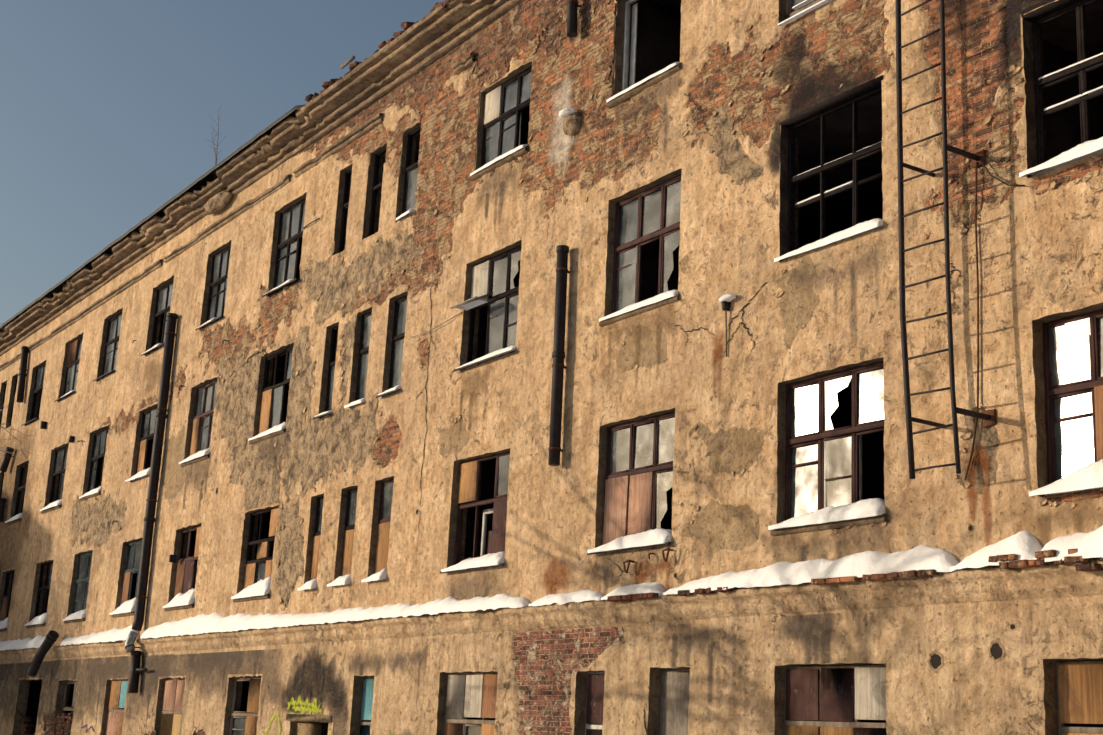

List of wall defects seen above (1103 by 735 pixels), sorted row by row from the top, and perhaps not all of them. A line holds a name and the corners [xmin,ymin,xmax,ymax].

flaking render [682,0,892,185]
flaking render [922,0,1025,235]
flaking render [1033,157,1103,195]
flaking render [102,0,672,611]
crack [675,282,767,358]
peeling [776,255,820,349]
peeling [692,421,768,477]
corrosion [968,447,989,520]
peeling [683,499,760,565]
flaking render [673,572,738,596]
flaking render [510,627,625,735]